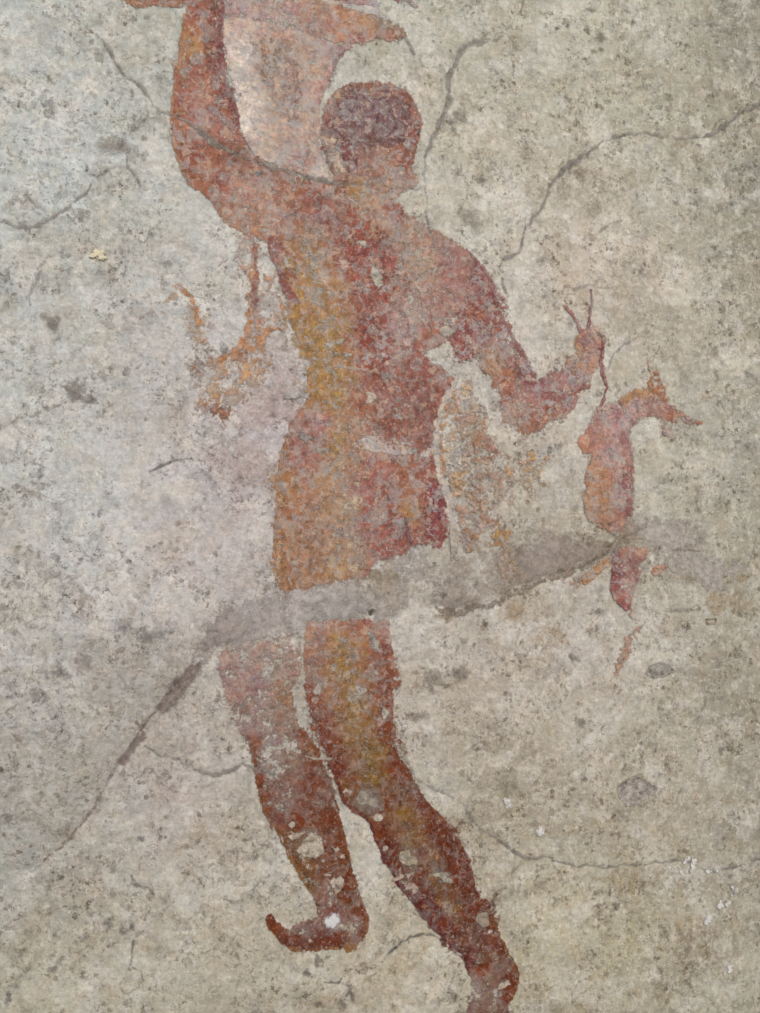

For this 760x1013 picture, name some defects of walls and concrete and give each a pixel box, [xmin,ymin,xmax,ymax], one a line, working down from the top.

crack [1,157,140,229]
crack [85,25,367,186]
crack [417,1,524,233]
crack [499,103,760,296]
crack [144,745,275,777]